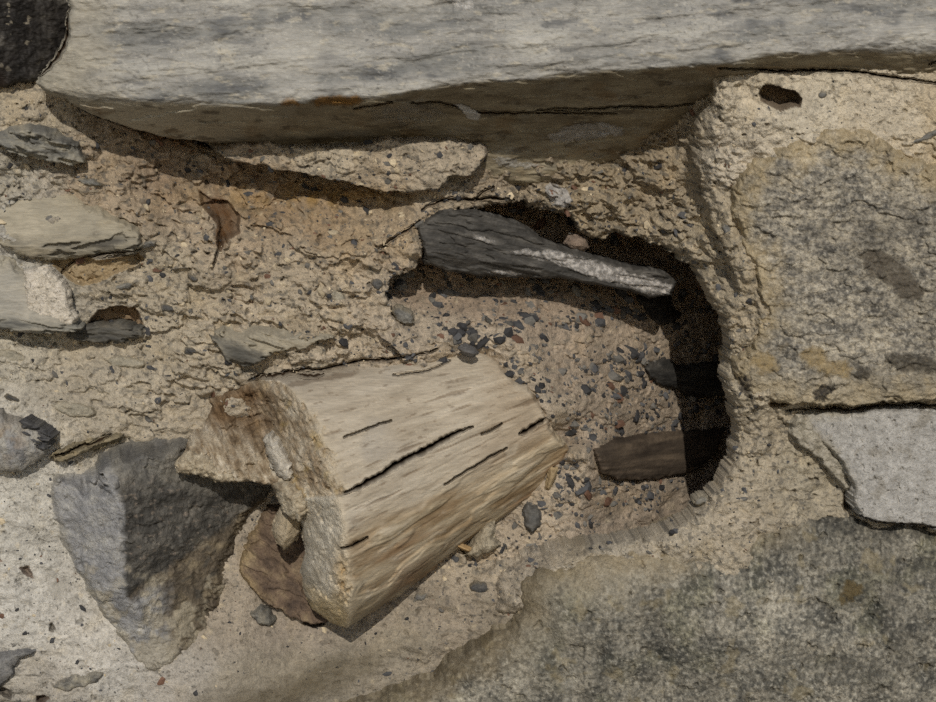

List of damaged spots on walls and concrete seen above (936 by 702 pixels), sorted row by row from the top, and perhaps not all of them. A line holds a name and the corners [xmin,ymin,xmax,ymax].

crack [353,101,694,116]
crack [249,348,451,381]
spalling [522,501,542,534]